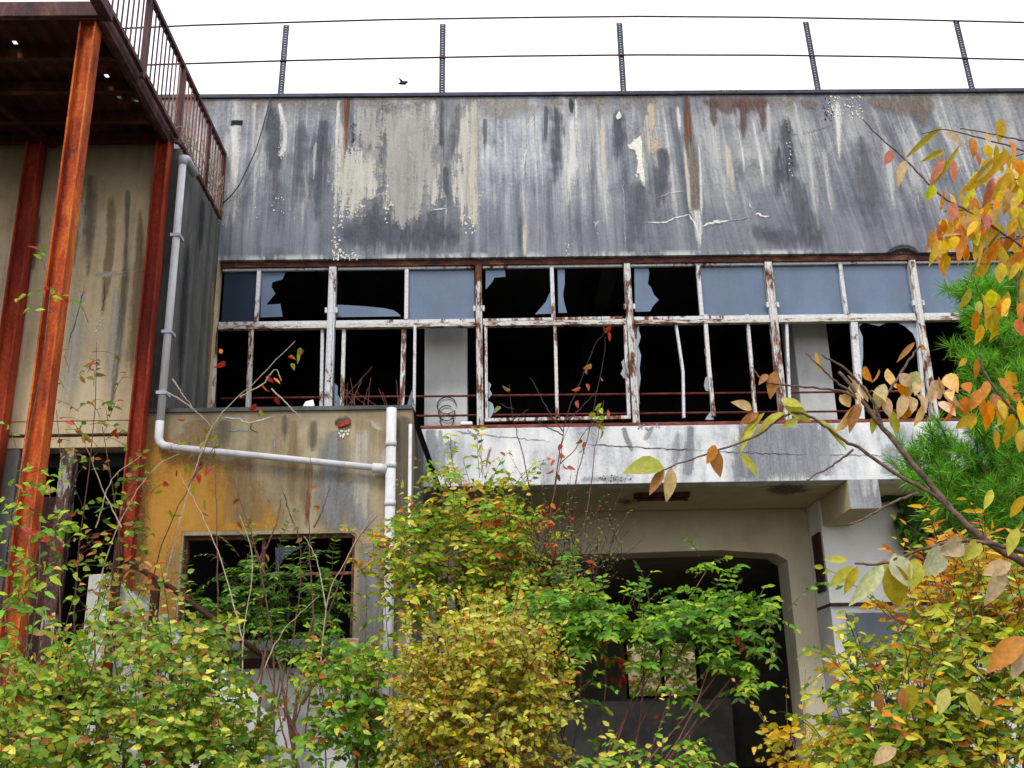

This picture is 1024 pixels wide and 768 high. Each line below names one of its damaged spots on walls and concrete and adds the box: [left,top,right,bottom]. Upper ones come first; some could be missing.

rust [102,200,115,308]
rust [130,216,144,370]
damp [223,101,389,221]
damp [544,96,627,203]
peeling [627,103,660,187]
damp [631,148,670,234]
rust [684,97,698,211]
crack [627,171,768,246]
damp [684,122,745,244]
rust [704,96,767,136]
damp [753,99,832,246]
spalling [335,418,351,438]